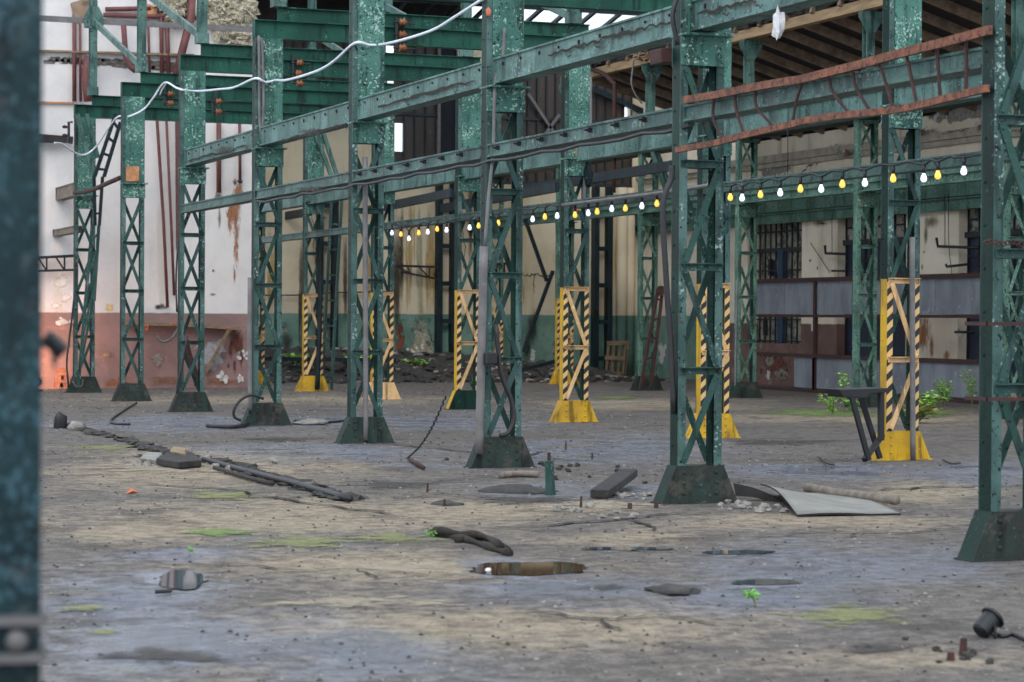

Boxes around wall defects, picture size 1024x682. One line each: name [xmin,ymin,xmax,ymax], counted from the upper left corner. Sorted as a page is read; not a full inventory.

rust [226,184,242,280]
peeling [193,339,248,384]